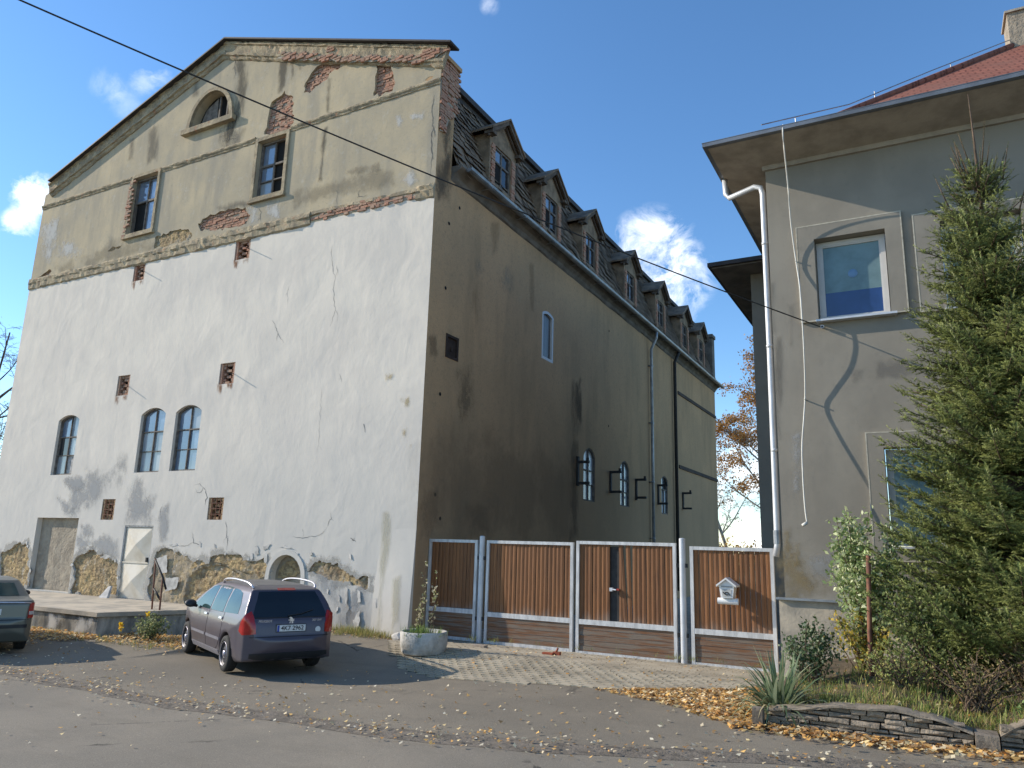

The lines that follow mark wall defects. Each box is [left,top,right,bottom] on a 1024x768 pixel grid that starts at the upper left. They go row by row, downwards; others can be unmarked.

flaking render [277,45,461,133]
flaking render [266,94,294,139]
flaking render [155,209,250,248]
flaking render [311,194,415,221]
water stain [62,474,101,512]
water stain [129,482,168,538]
flaking render [0,538,32,589]
flaking render [69,547,121,598]
flaking render [143,541,377,628]